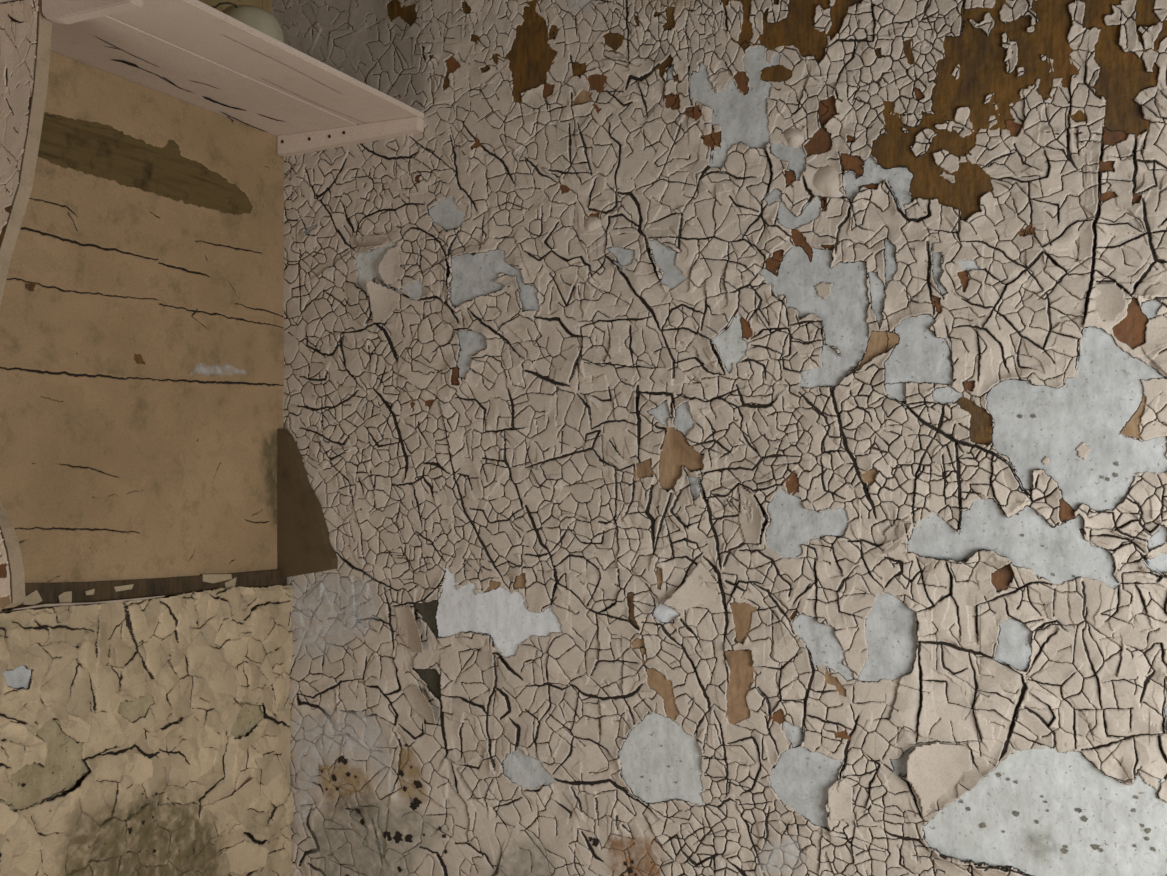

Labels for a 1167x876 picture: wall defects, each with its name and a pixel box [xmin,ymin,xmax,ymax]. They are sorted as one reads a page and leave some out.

peeling [480,0,559,104]
crack [603,0,665,114]
peeling [655,0,1167,220]
crack [7,198,284,328]
crack [0,367,327,386]
flaking render [758,196,1167,591]
crack [297,67,1167,876]
flaking render [414,567,563,657]
leakage [300,719,380,816]
leakage [383,831,425,843]
leakage [399,743,423,811]
flaking render [891,742,1167,876]